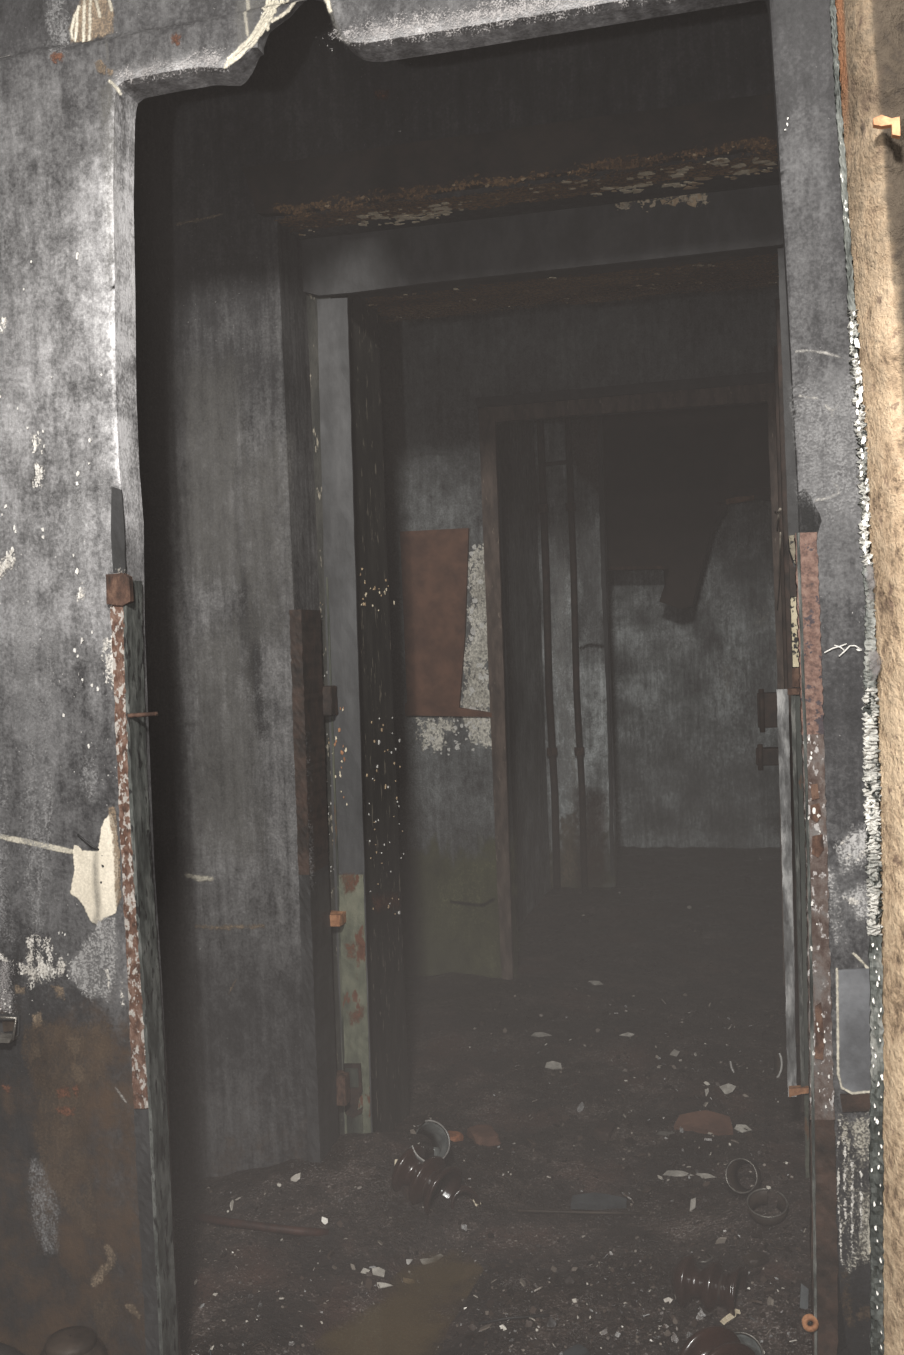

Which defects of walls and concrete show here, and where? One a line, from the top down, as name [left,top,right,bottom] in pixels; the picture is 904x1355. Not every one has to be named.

spalling [70,0,113,42]
leakage [108,0,301,95]
leakage [327,0,625,49]
peeling [273,117,789,236]
peeling [415,544,492,755]
peeling [70,807,122,925]
peeling [366,717,403,872]
corrosion [810,784,824,857]
peeling [0,932,71,1013]
peeling [818,943,883,1271]